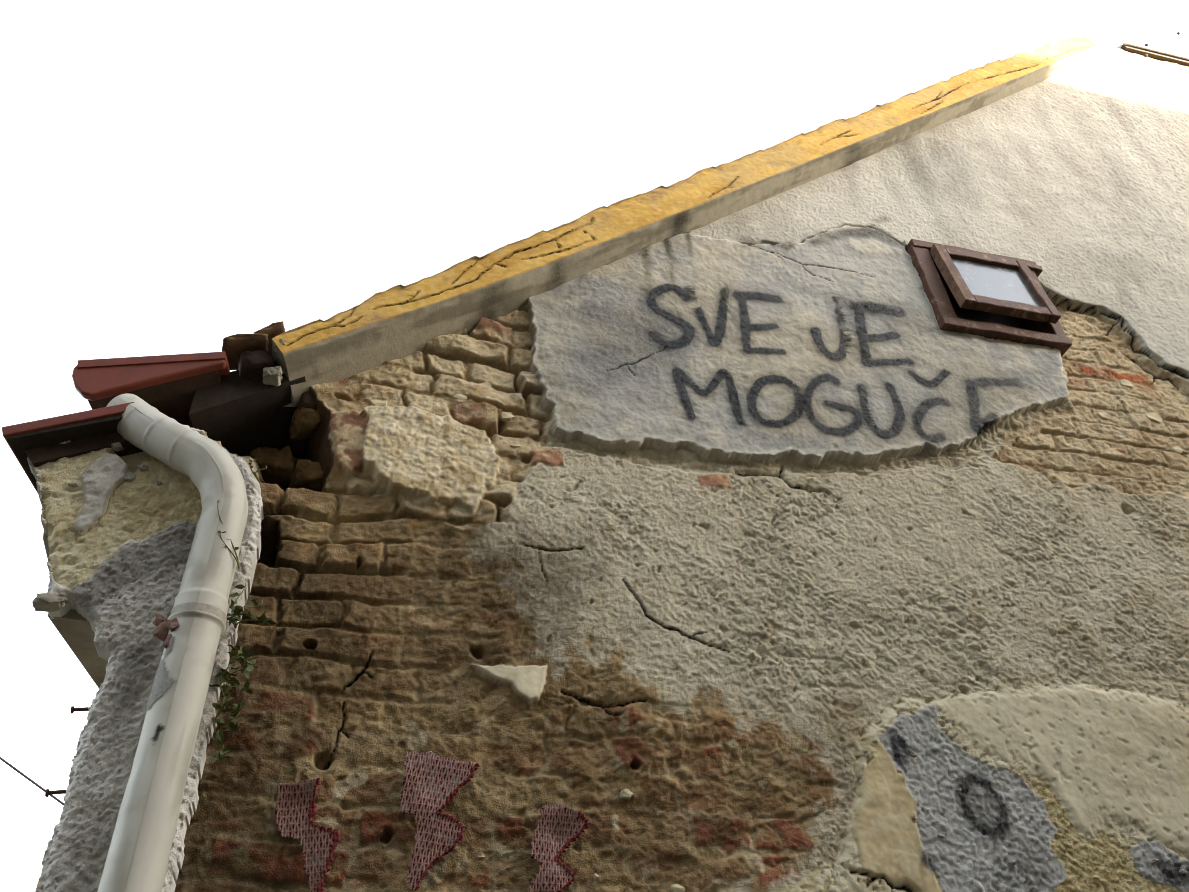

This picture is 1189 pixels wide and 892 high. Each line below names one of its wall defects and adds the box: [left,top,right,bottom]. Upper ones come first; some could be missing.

crack [918,51,1068,114]
crack [385,219,594,307]
crack [749,245,872,282]
spalling [991,288,1189,498]
spalling [32,442,202,612]
spalling [175,300,836,892]
crack [622,579,729,653]
peeling [146,636,176,710]
flaking render [850,683,1189,892]